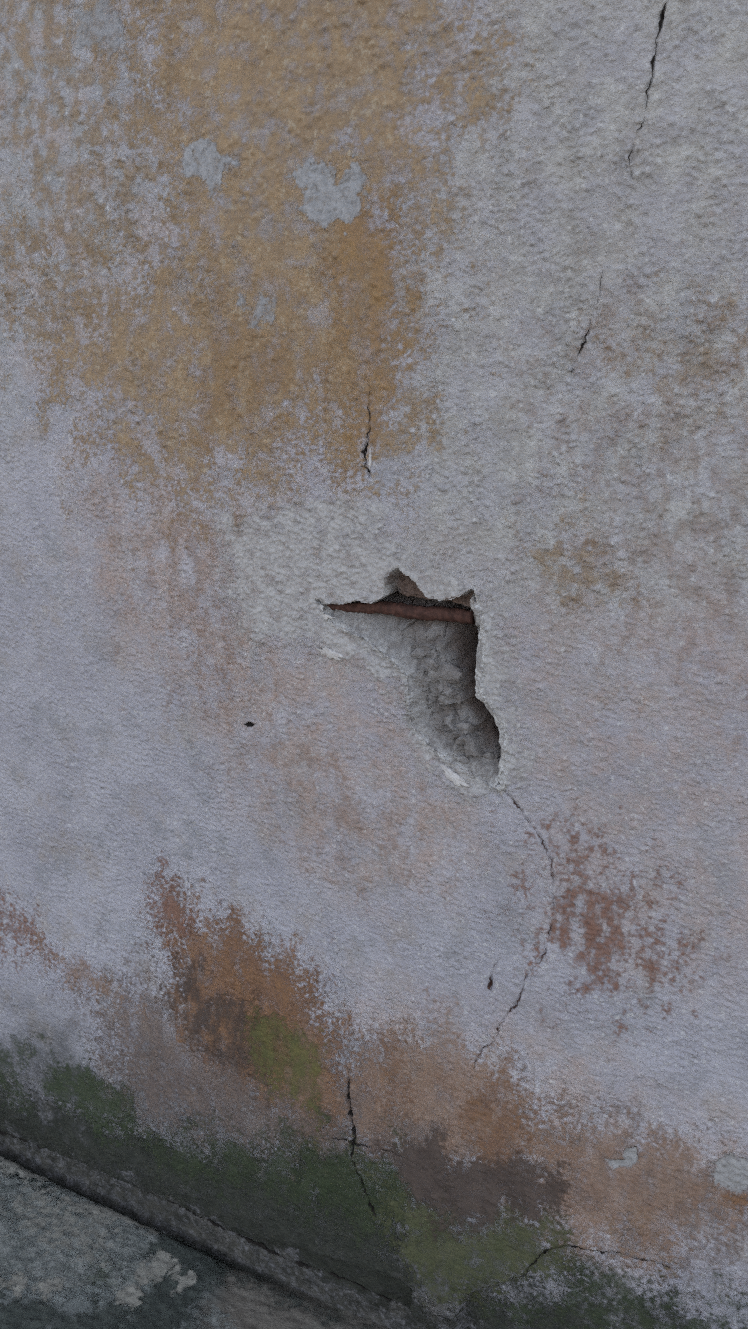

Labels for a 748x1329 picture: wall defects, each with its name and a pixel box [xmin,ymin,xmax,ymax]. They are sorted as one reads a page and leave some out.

crack [628,2,667,179]
crack [571,276,602,374]
peeling [213,492,536,805]
crack [475,792,554,1062]
water stain [74,957,606,1238]
crack [334,1072,411,1217]
crack [521,1245,685,1277]